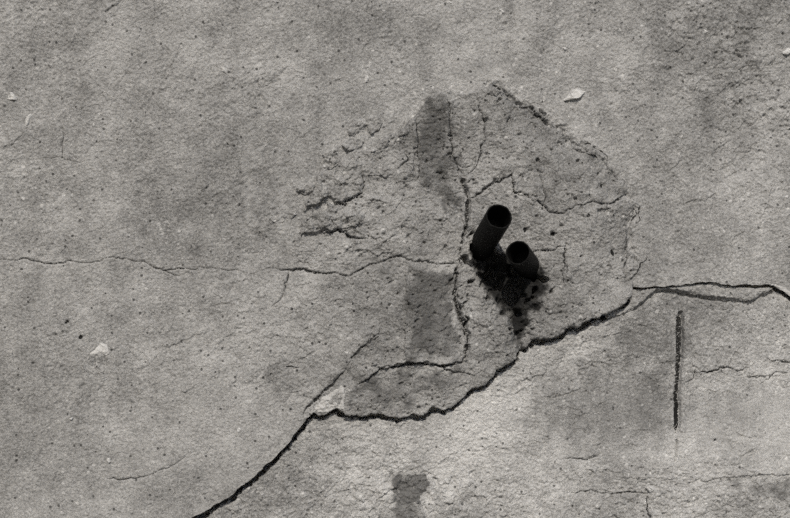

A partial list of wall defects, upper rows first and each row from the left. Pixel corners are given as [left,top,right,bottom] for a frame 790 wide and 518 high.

crack [492,85,565,134]
crack [261,99,647,384]
crack [0,257,230,276]
crack [304,331,380,412]
crack [688,360,788,384]
crack [577,490,651,518]